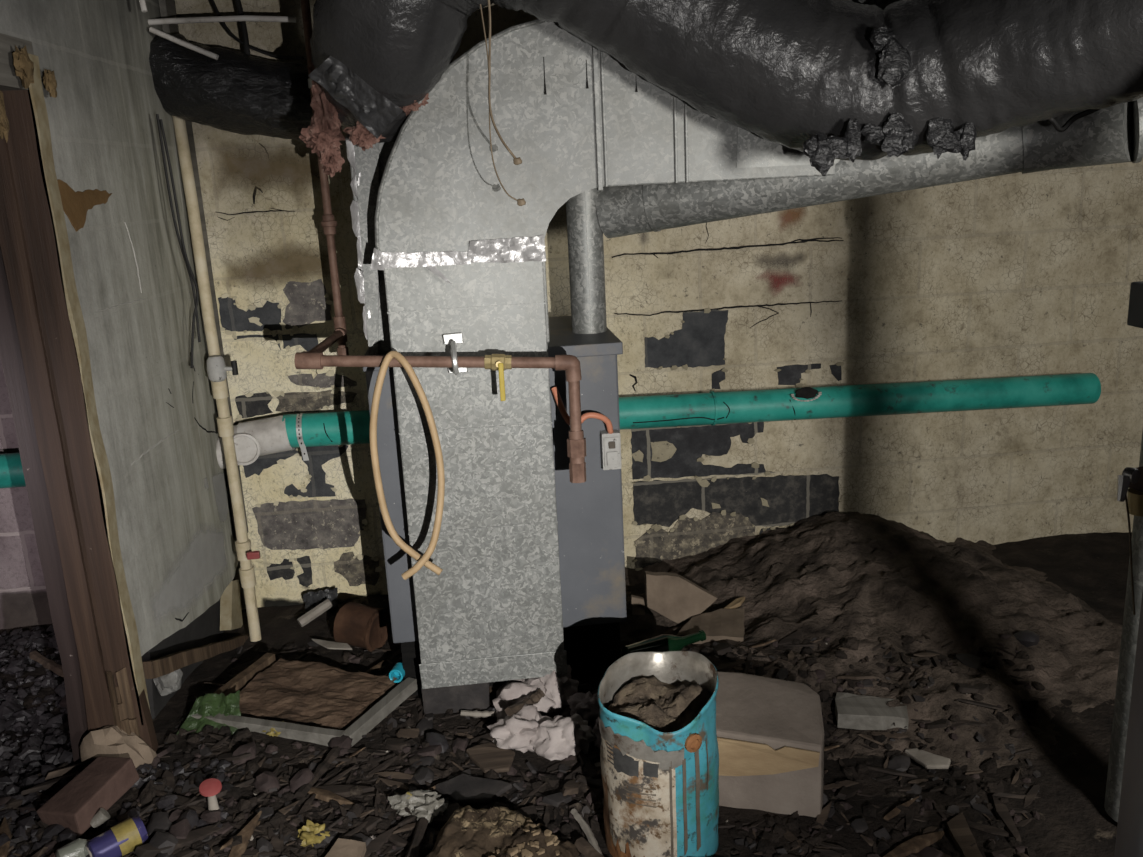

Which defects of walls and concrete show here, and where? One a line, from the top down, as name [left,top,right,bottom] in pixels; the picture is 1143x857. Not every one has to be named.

leakage [220,151,319,188]
leakage [233,249,329,282]
crack [612,223,844,258]
peeling [218,279,333,351]
peeling [644,308,729,391]
peeling [235,370,357,423]
peeling [775,362,844,402]
peeling [243,445,383,590]
peeling [631,422,841,571]